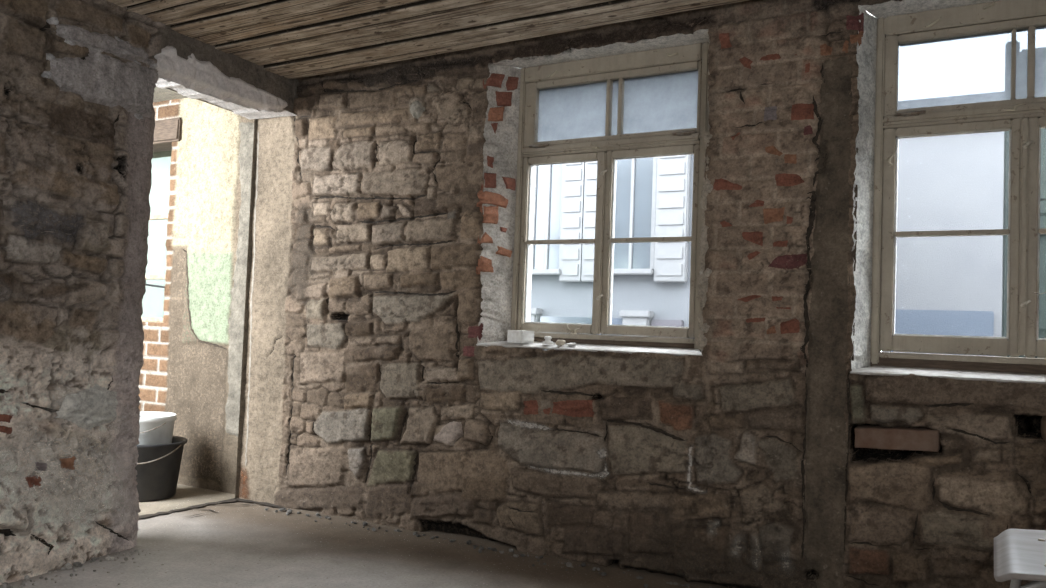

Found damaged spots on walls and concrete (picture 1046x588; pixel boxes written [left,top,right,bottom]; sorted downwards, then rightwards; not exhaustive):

peeling [41,17,288,120]
spalling [483,73,519,134]
spalling [476,156,516,274]
crack [766,63,827,557]
crack [0,389,60,413]
crack [0,529,54,555]